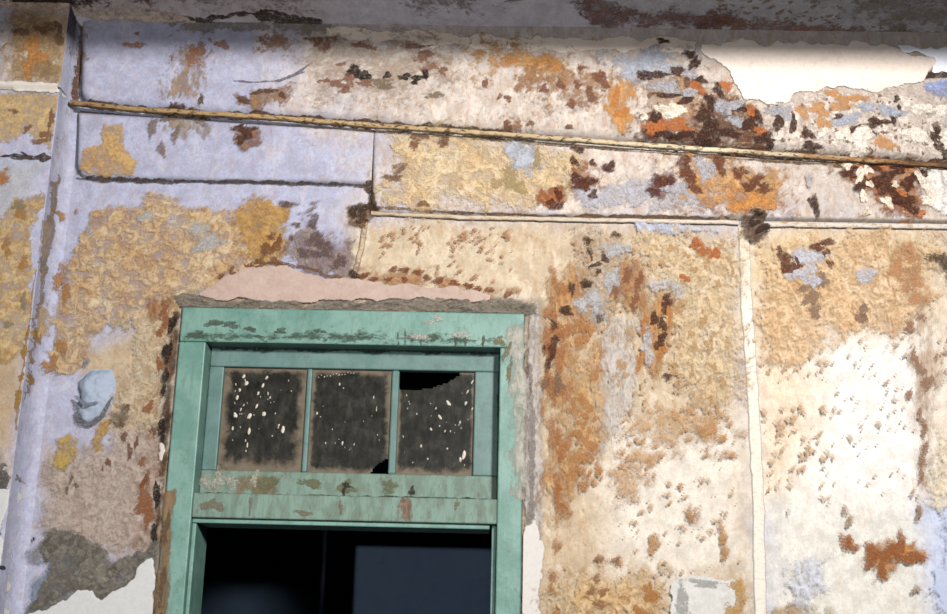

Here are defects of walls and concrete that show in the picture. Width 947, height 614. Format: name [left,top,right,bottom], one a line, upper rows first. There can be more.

crack [1,152,51,162]
crack [76,175,736,220]
crack [12,0,947,173]
corrosion [535,146,615,210]
water stain [574,0,947,33]
flaking render [627,38,947,224]
peeling [0,191,490,551]
corrosion [532,256,748,614]
peeling [559,226,754,415]
corrosion [646,152,947,521]
corrosion [840,504,930,581]